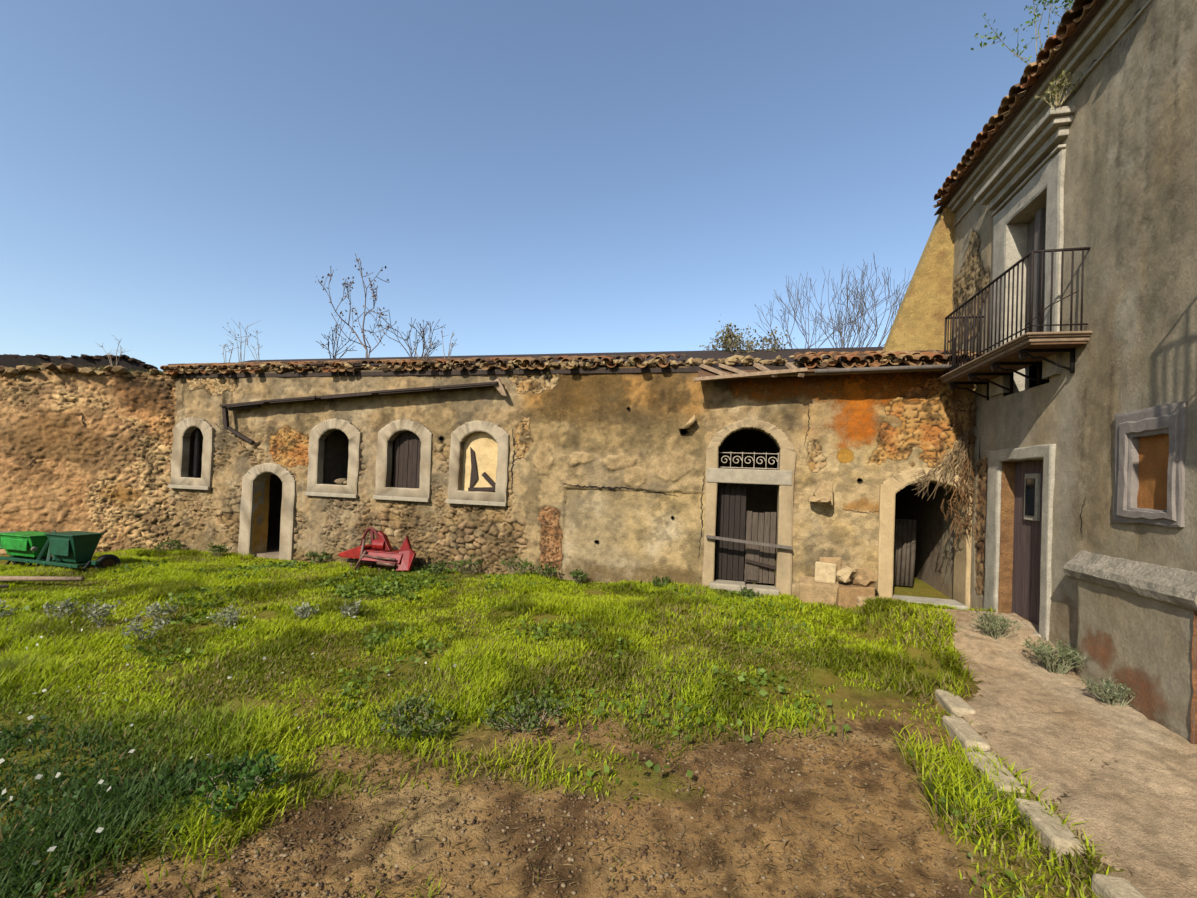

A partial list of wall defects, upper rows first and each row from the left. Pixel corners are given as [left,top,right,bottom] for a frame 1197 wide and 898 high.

peeling [269,425,309,468]
spalling [867,378,969,468]